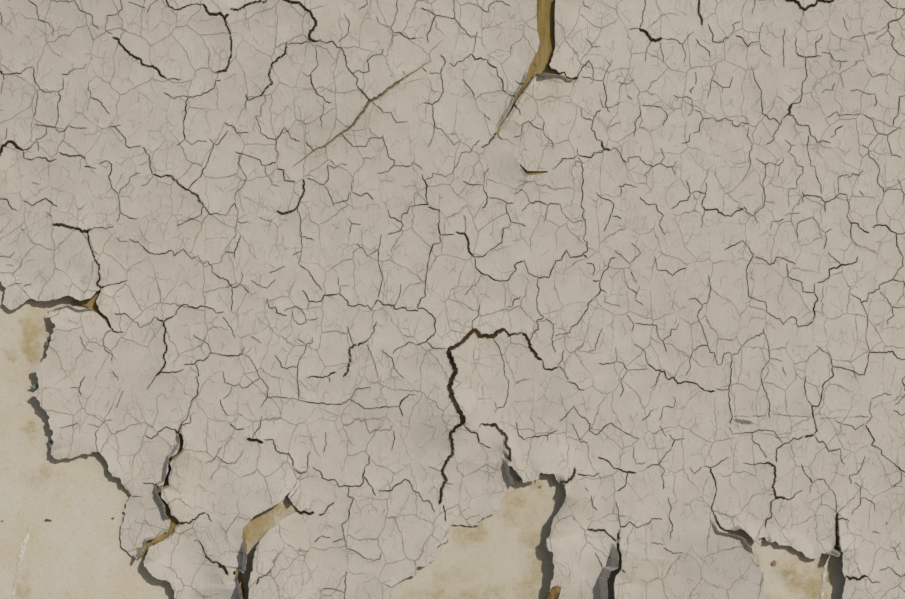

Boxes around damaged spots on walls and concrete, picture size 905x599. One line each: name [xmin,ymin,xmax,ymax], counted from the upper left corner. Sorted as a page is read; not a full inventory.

crack [195,540,270,599]
crack [0,0,684,561]
peeling [0,142,881,599]
crack [592,0,905,551]
crack [846,531,905,592]